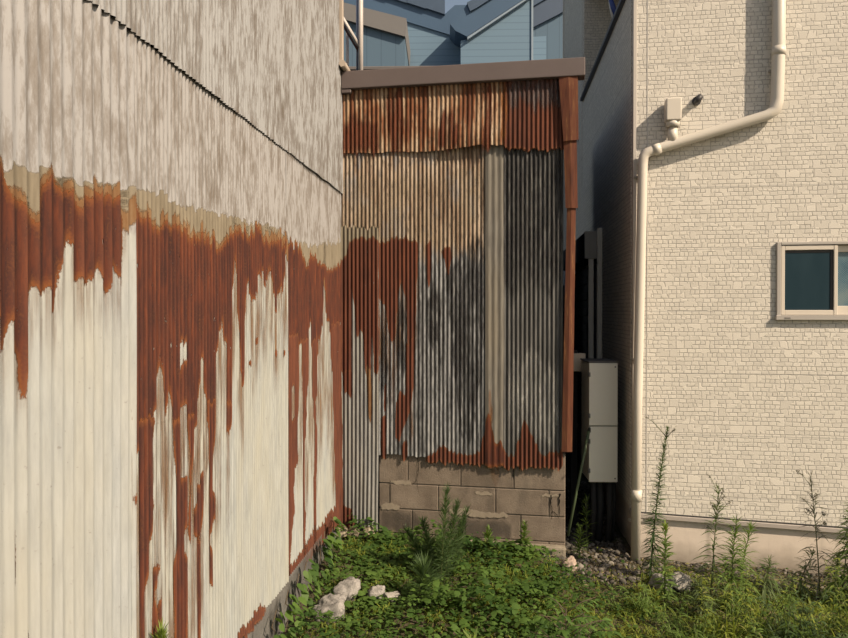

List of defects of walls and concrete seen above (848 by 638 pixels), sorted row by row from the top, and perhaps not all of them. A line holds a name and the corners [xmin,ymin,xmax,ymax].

corrosion [343,117,379,155]
corrosion [386,88,404,151]
corrosion [438,110,458,147]
corrosion [483,83,492,151]
corrosion [502,78,564,153]
corrosion [0,164,123,399]
corrosion [441,246,452,275]
leakage [427,238,485,446]
corrosion [131,203,432,638]
corrosion [426,408,563,471]